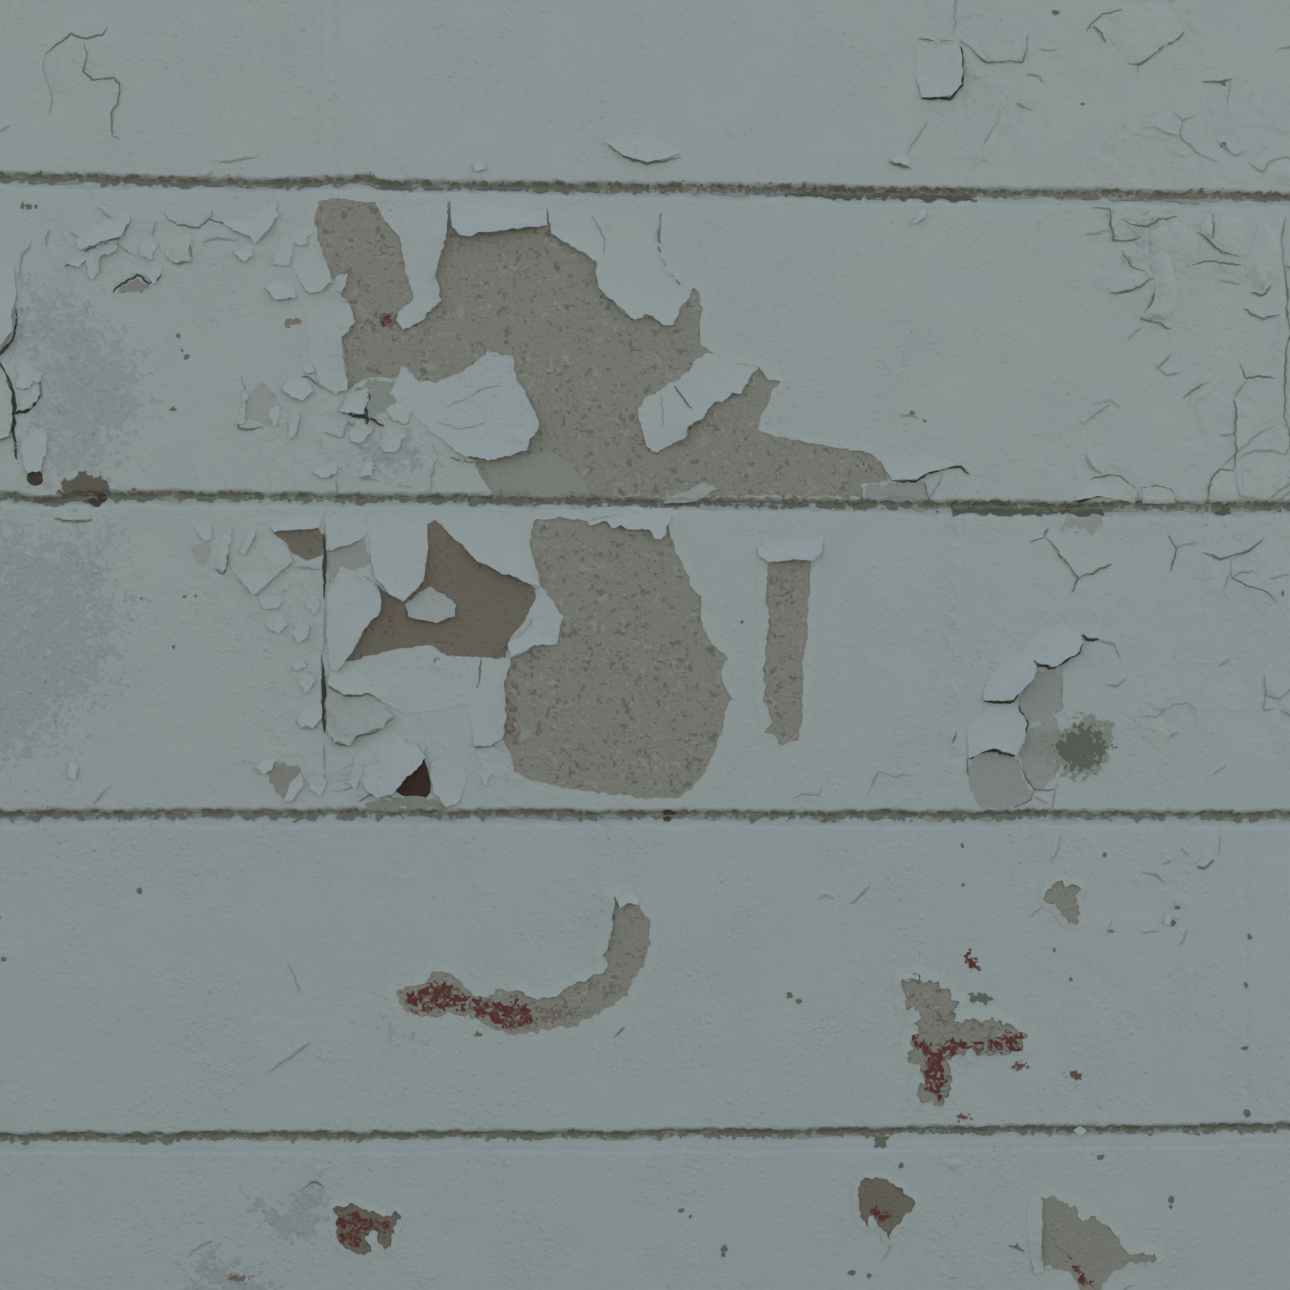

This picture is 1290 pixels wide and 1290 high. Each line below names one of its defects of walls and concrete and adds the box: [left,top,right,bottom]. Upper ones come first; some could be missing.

crack [890,0,1058,169]
crack [1087,9,1122,43]
crack [1129,32,1184,70]
crack [1146,113,1289,172]
crack [1074,207,1290,505]
peeling [269,511,369,560]
peeling [291,189,896,810]
crack [1168,535,1289,602]
peeling [387,888,661,1044]
peeling [892,964,1038,1115]
peeling [327,1197,408,1261]
peeling [1015,1186,1166,1290]